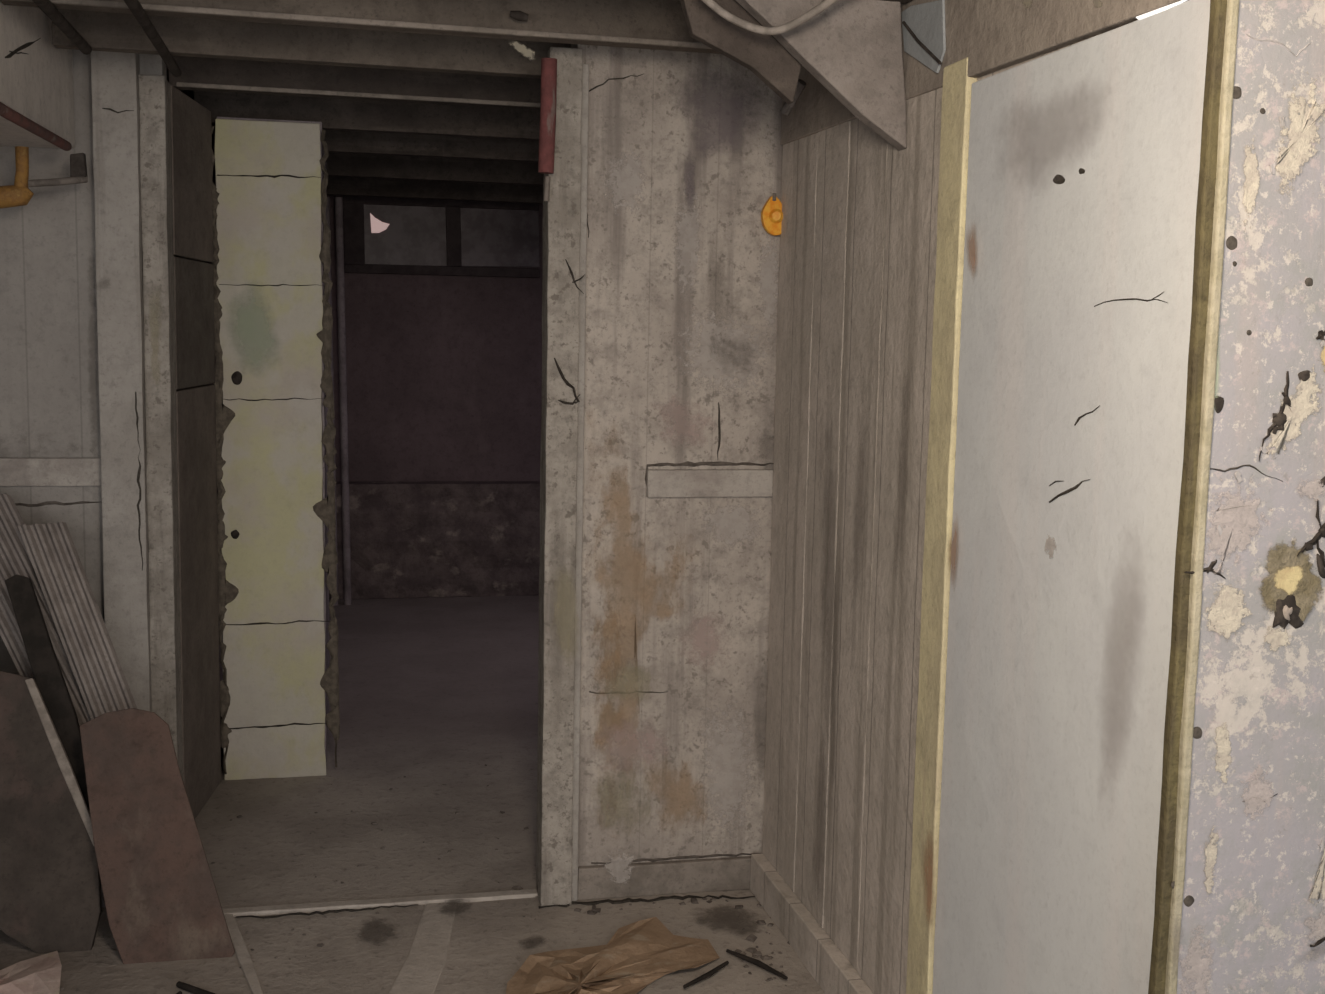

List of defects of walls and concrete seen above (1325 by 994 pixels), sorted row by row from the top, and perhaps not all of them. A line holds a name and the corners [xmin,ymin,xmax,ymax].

spalling [211,126,239,774]
spalling [313,130,340,767]
crack [554,358,580,405]
spalling [1214,396,1224,413]
peeling [1260,336,1325,458]
spalling [1204,471,1325,652]
peeling [1309,840,1325,902]